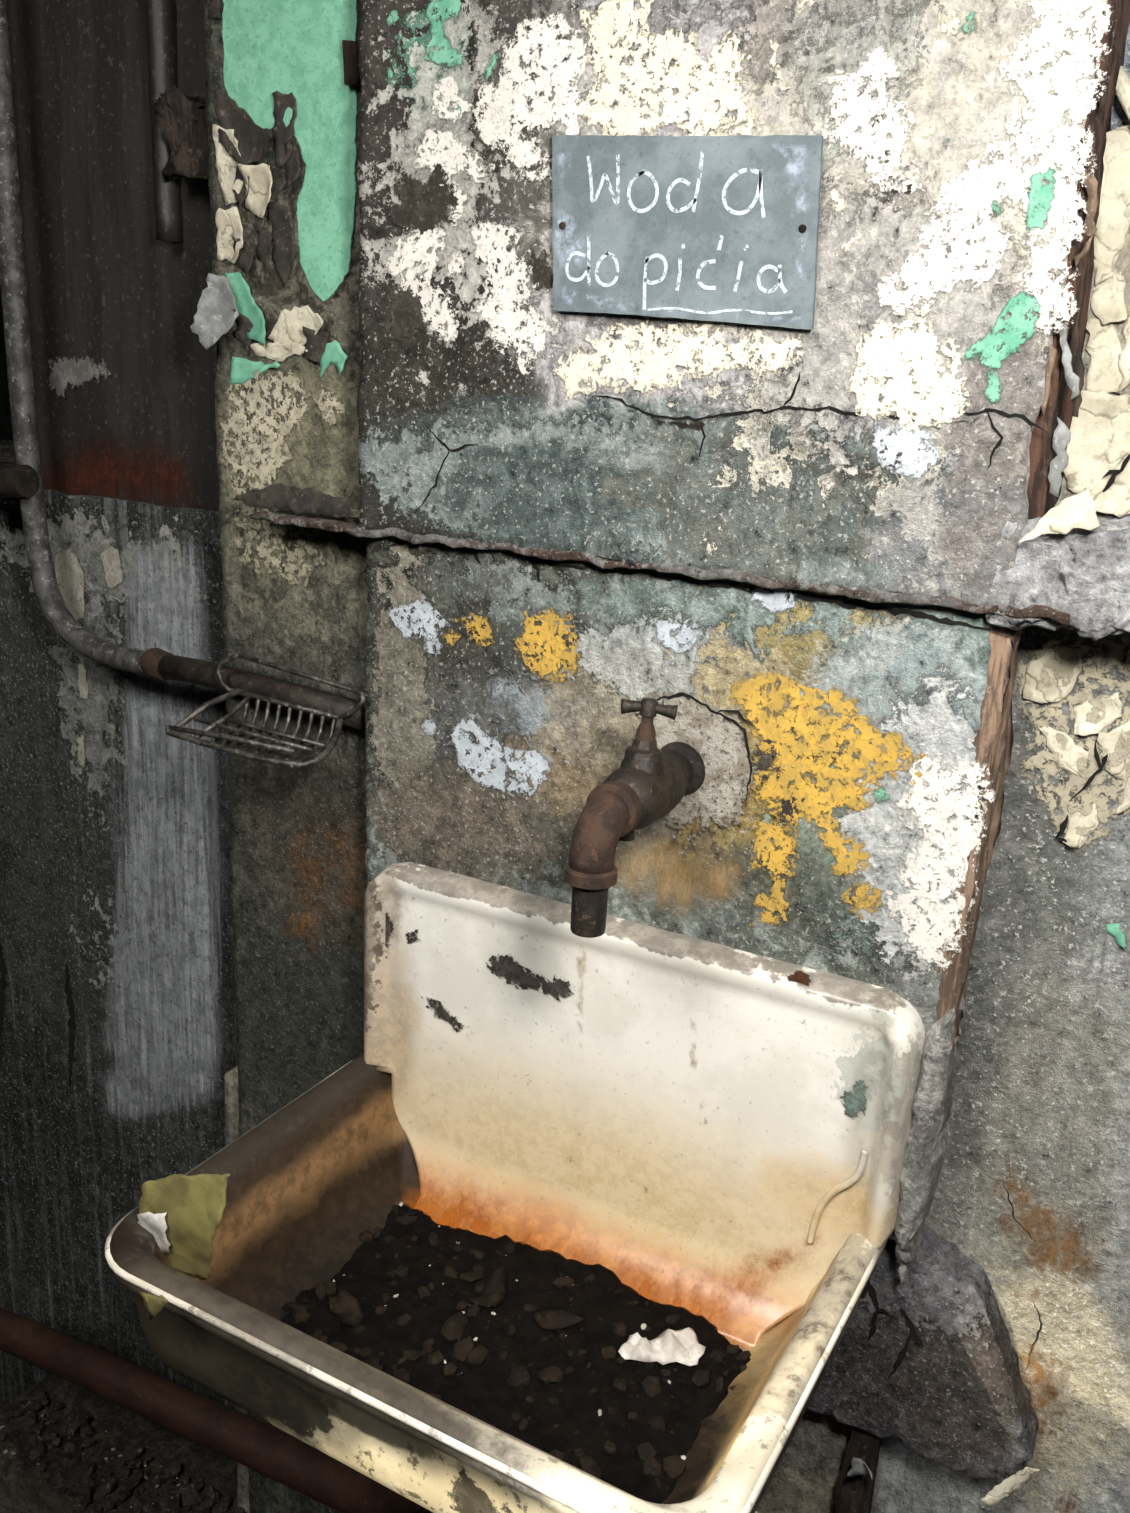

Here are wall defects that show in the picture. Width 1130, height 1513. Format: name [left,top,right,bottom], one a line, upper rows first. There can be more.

peeling [375,0,804,401]
peeling [190,0,358,588]
peeling [817,0,1130,543]
crack [596,372,1047,469]
peeling [388,595,499,658]
peeling [513,607,584,686]
peeling [746,586,797,614]
peeling [421,712,552,798]
peeling [1013,634,1130,852]
peeling [632,668,996,972]
peeling [421,996,474,1038]
peeling [980,1467,1039,1508]